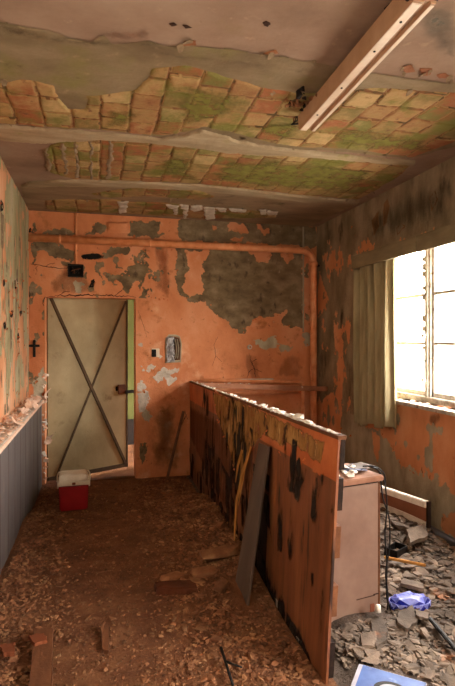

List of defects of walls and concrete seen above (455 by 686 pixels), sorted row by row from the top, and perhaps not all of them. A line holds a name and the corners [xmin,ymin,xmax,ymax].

flaking render [0,64,455,538]